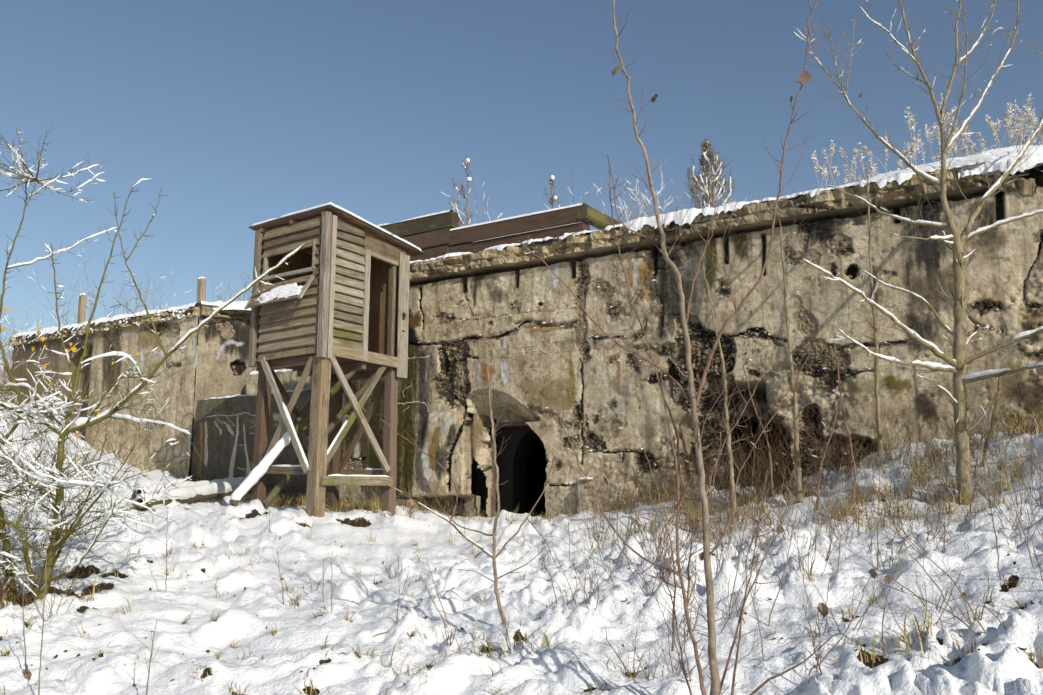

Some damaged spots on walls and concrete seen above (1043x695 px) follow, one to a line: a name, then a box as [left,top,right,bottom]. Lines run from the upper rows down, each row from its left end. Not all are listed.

crack [396,385,473,500]
spalling [431,311,518,408]
crack [408,286,572,373]
spalling [530,260,622,364]
spalling [526,397,628,471]
crack [550,319,647,487]
crack [721,327,785,346]
spalling [607,261,906,491]
leakage [798,217,837,247]
spalling [783,221,861,280]
leakage [899,200,954,352]
crack [1023,236,1043,302]